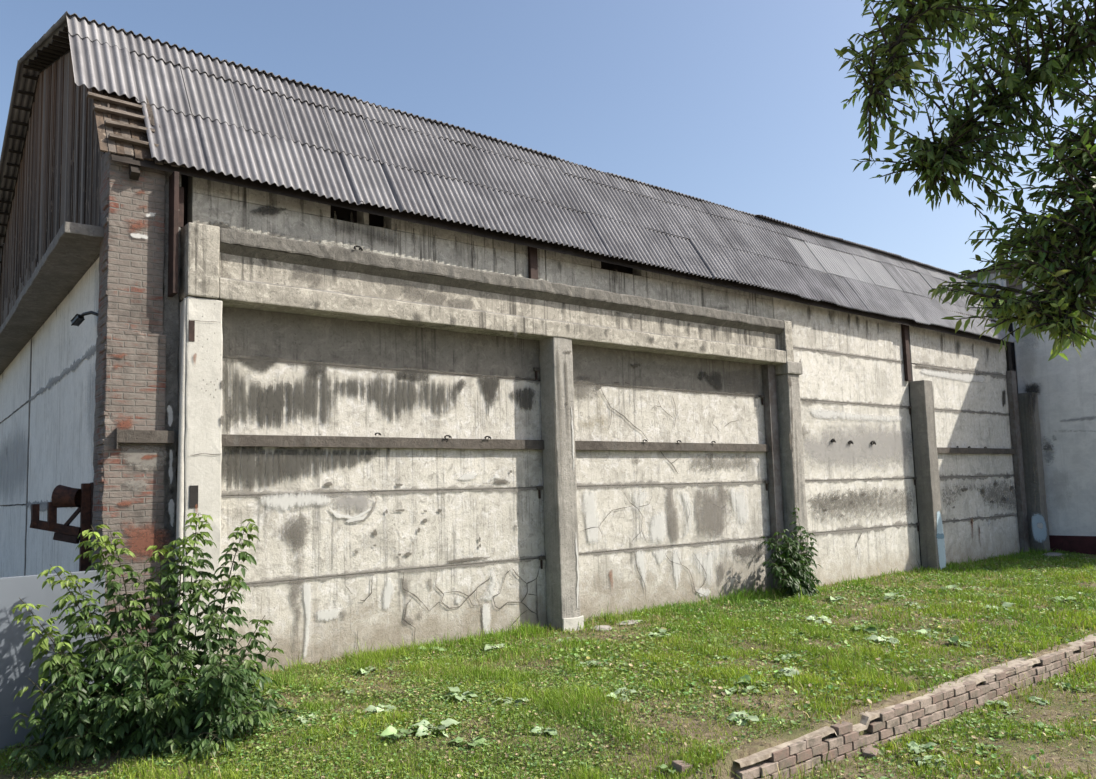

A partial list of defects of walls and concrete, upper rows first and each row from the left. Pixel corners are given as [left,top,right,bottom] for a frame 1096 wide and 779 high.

damp [259,381,290,428]
crack [601,389,678,473]
crack [402,567,540,641]
damp [583,490,600,542]
crack [585,493,651,594]
damp [636,486,763,597]
crack [667,555,742,595]